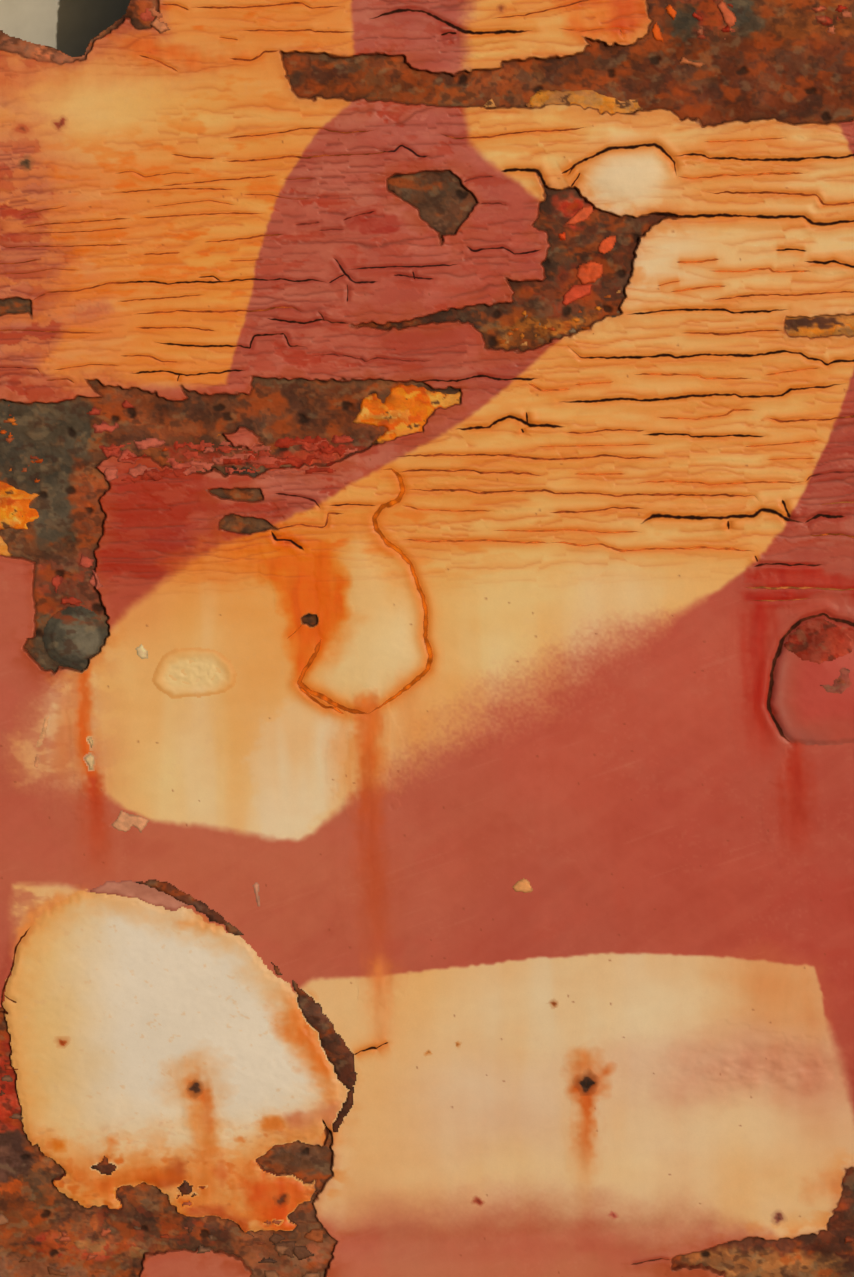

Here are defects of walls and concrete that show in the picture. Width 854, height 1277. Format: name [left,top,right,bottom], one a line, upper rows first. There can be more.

crack [162,0,627,61]
corrosion [0,0,854,139]
corrosion [16,154,36,173]
corrosion [387,171,477,241]
corrosion [358,186,679,351]
crack [0,127,854,741]
corrosion [0,377,460,964]
corrosion [0,659,854,1277]